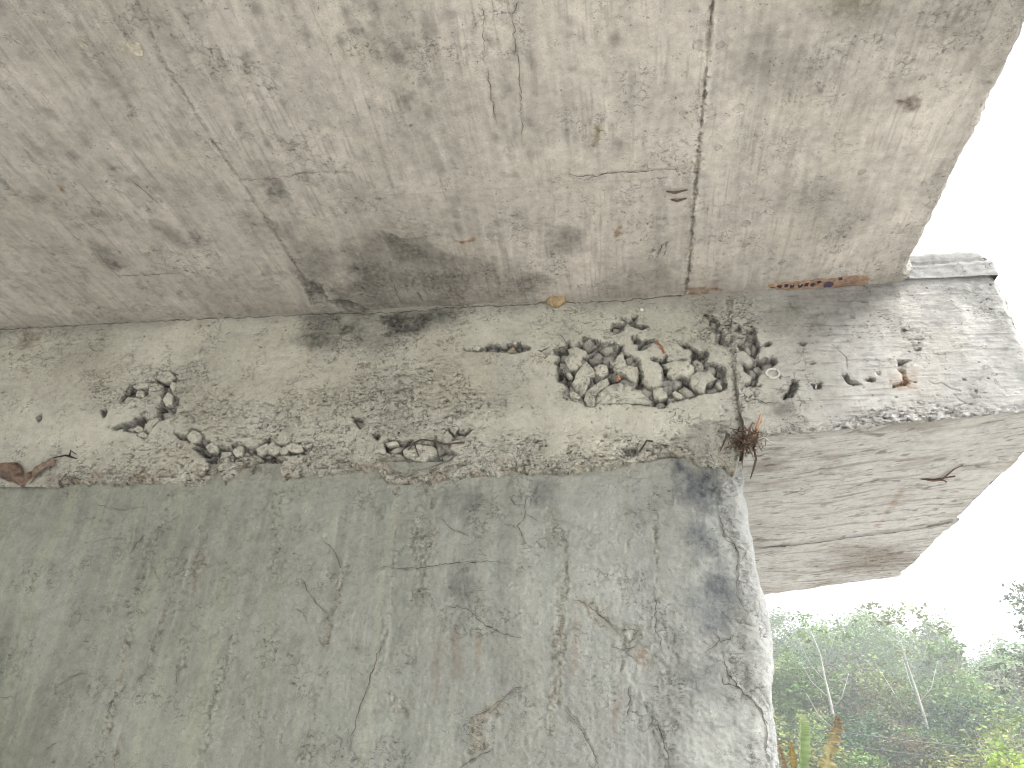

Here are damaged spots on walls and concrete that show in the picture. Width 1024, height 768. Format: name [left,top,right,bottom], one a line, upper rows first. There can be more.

crack [482,2,524,144]
crack [562,169,688,179]
spalling [462,340,532,354]
spalling [552,314,779,410]
spalling [890,359,917,390]
spalling [99,370,180,440]
spalling [173,427,314,480]
spalling [350,417,473,479]
crack [503,485,539,539]
crack [378,560,505,570]
crack [448,605,524,639]
crack [708,507,770,757]